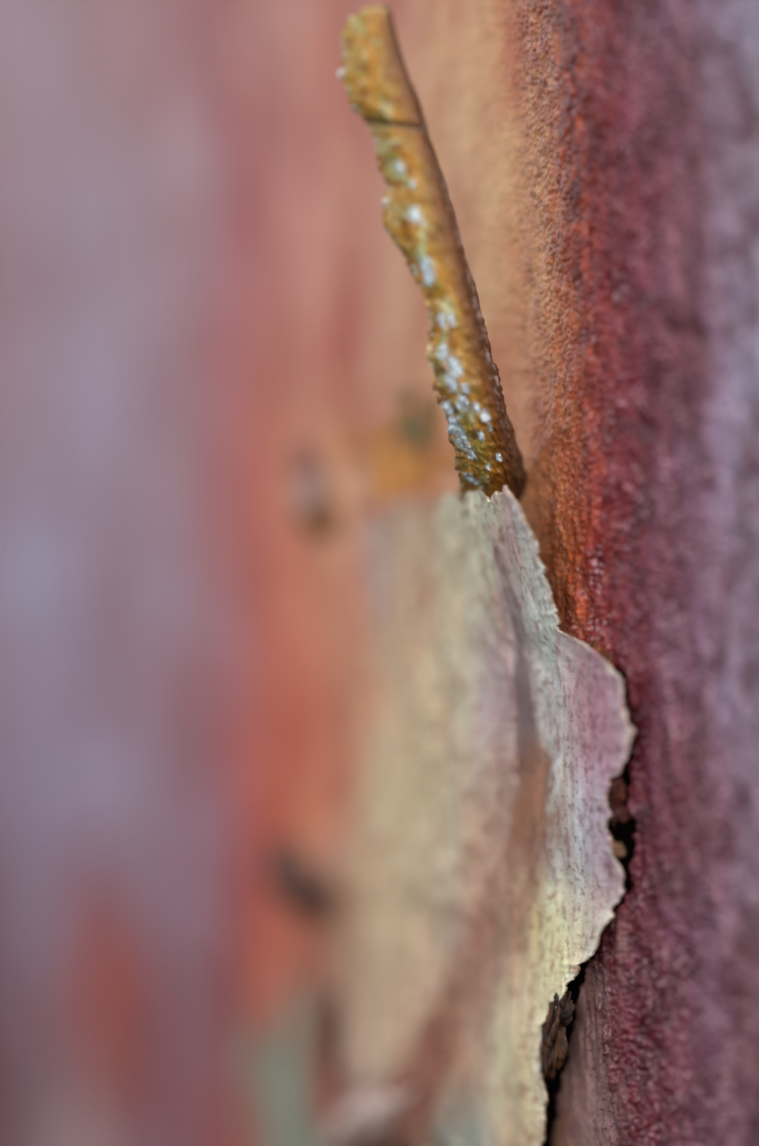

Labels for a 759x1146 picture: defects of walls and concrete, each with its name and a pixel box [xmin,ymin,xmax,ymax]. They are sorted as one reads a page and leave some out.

peeling [583,639,614,667]
peeling [607,776,630,857]
peeling [322,984,417,1146]
peeling [541,974,615,1146]